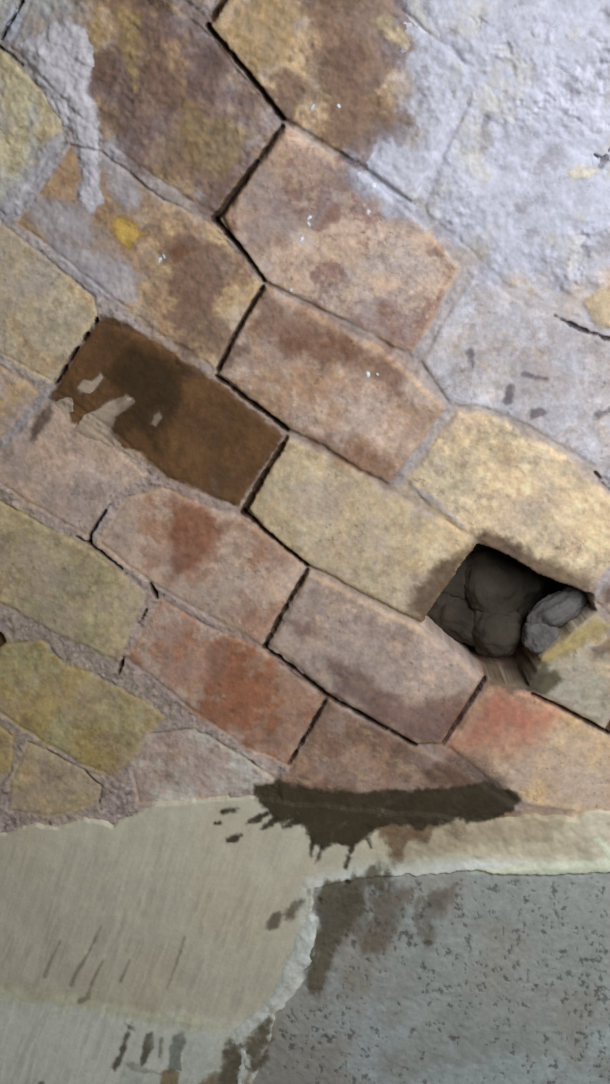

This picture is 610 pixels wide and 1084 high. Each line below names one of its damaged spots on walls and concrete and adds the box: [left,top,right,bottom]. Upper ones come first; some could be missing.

leakage [0,0,176,302]
leakage [316,0,610,292]
leakage [51,317,282,505]
spalling [426,544,588,658]
leakage [248,779,521,883]